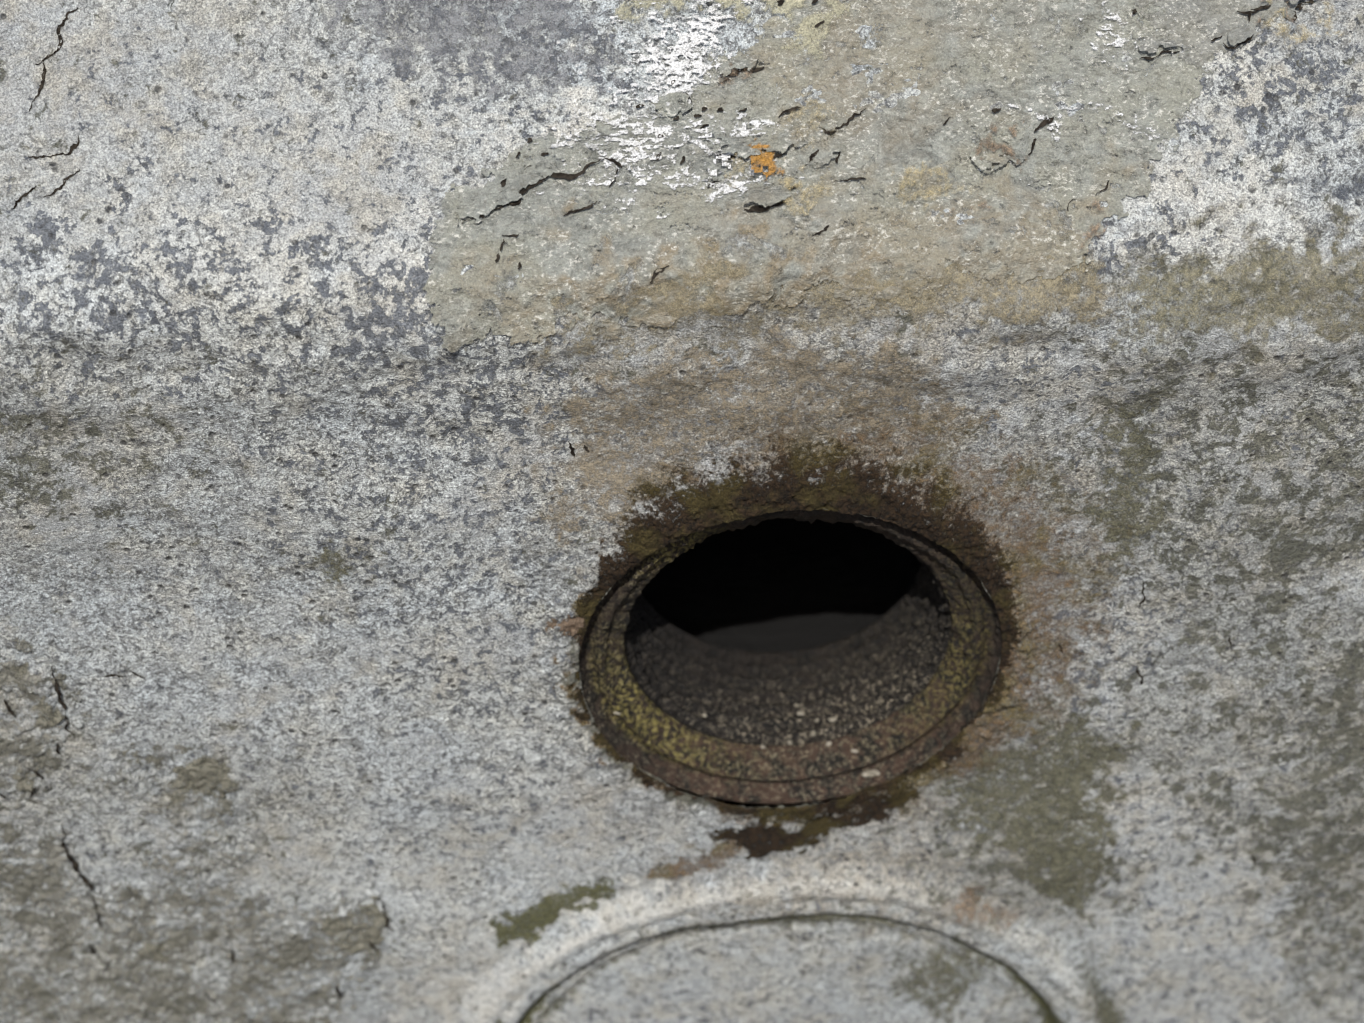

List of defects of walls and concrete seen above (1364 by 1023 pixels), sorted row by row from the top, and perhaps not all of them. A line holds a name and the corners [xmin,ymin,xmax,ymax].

crack [29,8,78,112]
crack [11,135,80,210]
crack [462,158,622,251]
rust [725,139,828,214]
peeling [423,0,1316,360]
rust [545,415,1119,881]